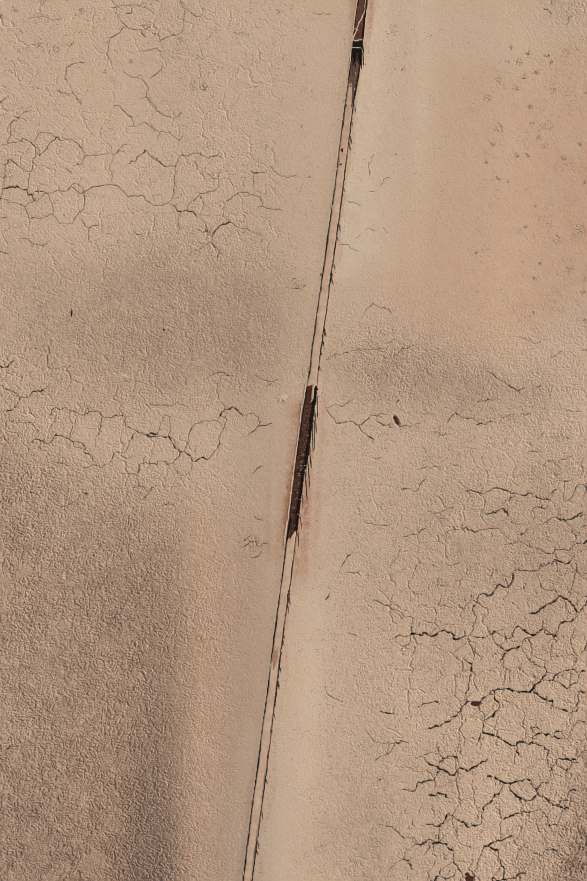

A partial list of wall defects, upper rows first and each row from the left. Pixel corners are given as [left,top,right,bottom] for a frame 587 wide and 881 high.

rust [348,0,381,79]
crack [0,0,298,258]
crack [0,361,272,507]
rust [261,377,347,603]
crack [326,399,530,492]